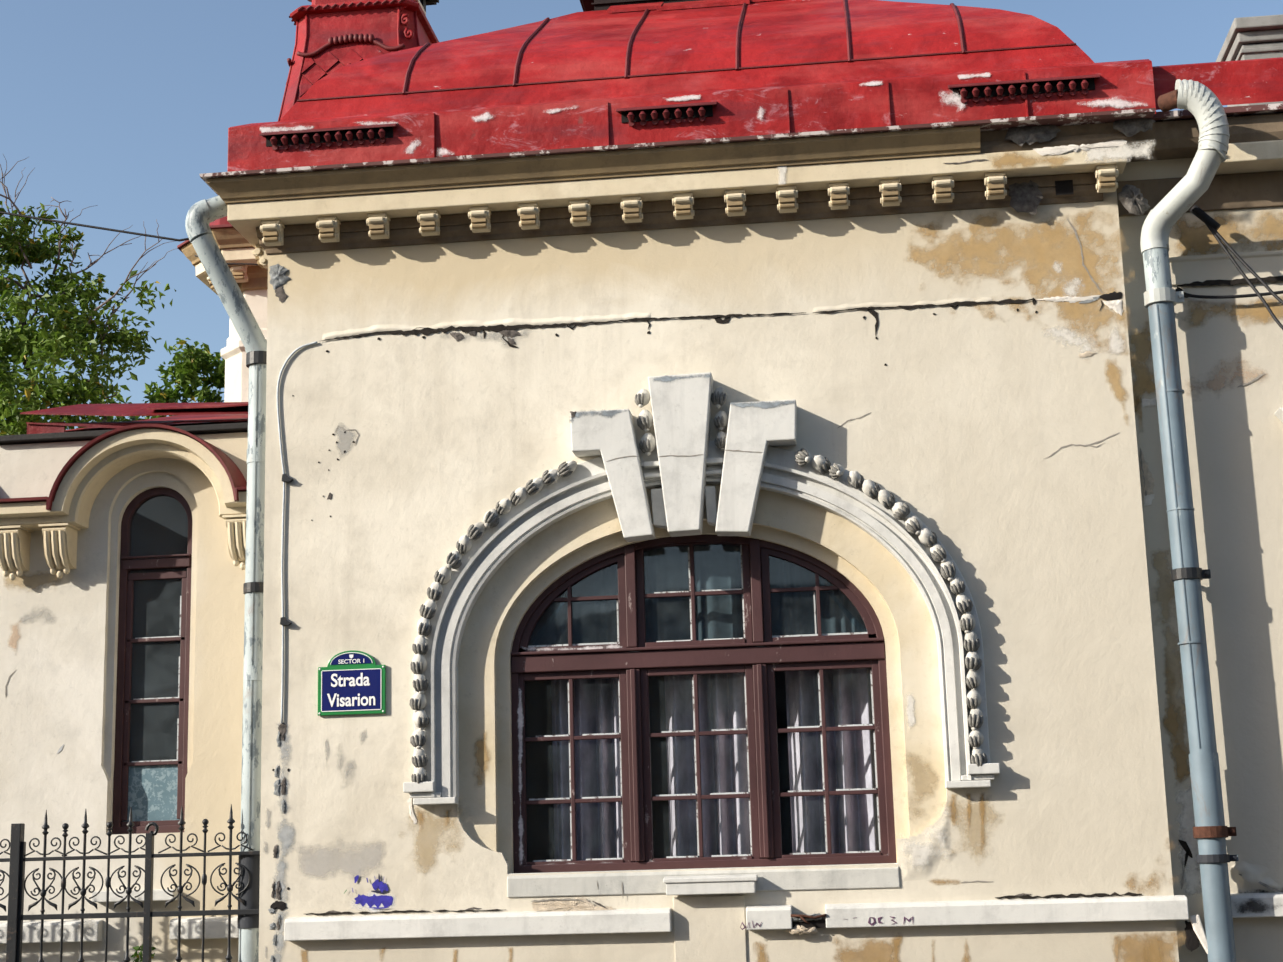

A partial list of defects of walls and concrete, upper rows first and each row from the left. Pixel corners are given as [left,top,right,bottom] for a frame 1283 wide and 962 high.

crack [322,297,1038,366]
flaking render [1079,292,1123,316]
peeling [318,426,359,471]
crack [1044,432,1120,459]
damp [1153,552,1190,780]
spalling [264,723,294,962]